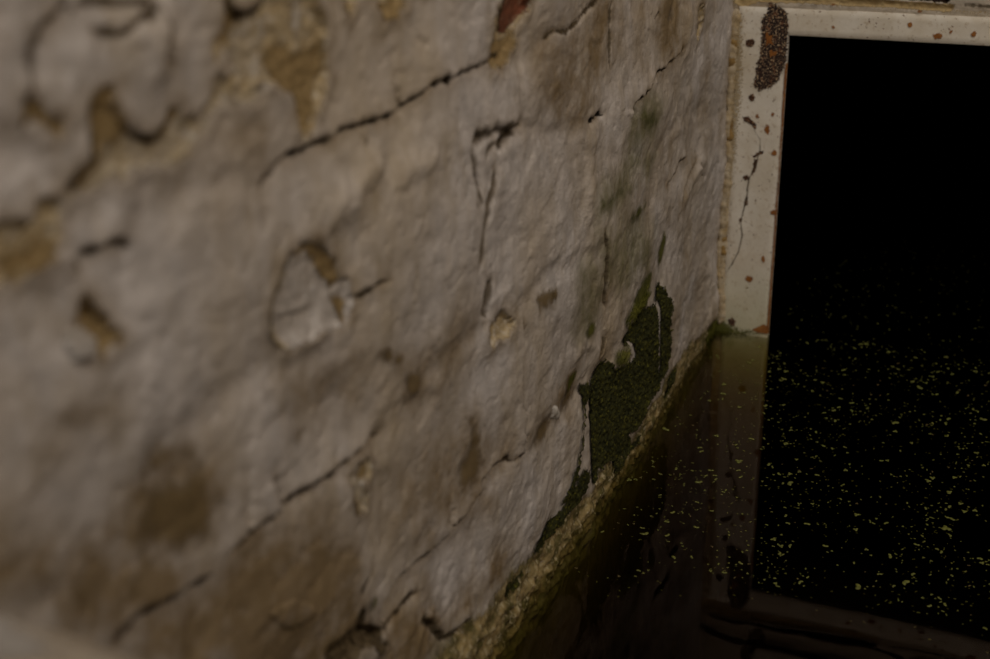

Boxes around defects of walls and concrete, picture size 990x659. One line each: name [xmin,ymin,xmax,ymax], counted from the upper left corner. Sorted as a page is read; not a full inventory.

spalling [61,297,124,360]
crack [21,0,176,129]
crack [76,240,129,269]
spalling [0,0,330,284]
spalling [270,240,354,350]
crack [355,281,384,299]
crack [260,61,487,185]
crack [471,123,518,317]
spalling [436,0,954,659]
corrosion [729,2,789,334]
spalling [325,609,389,659]
crack [361,557,470,640]